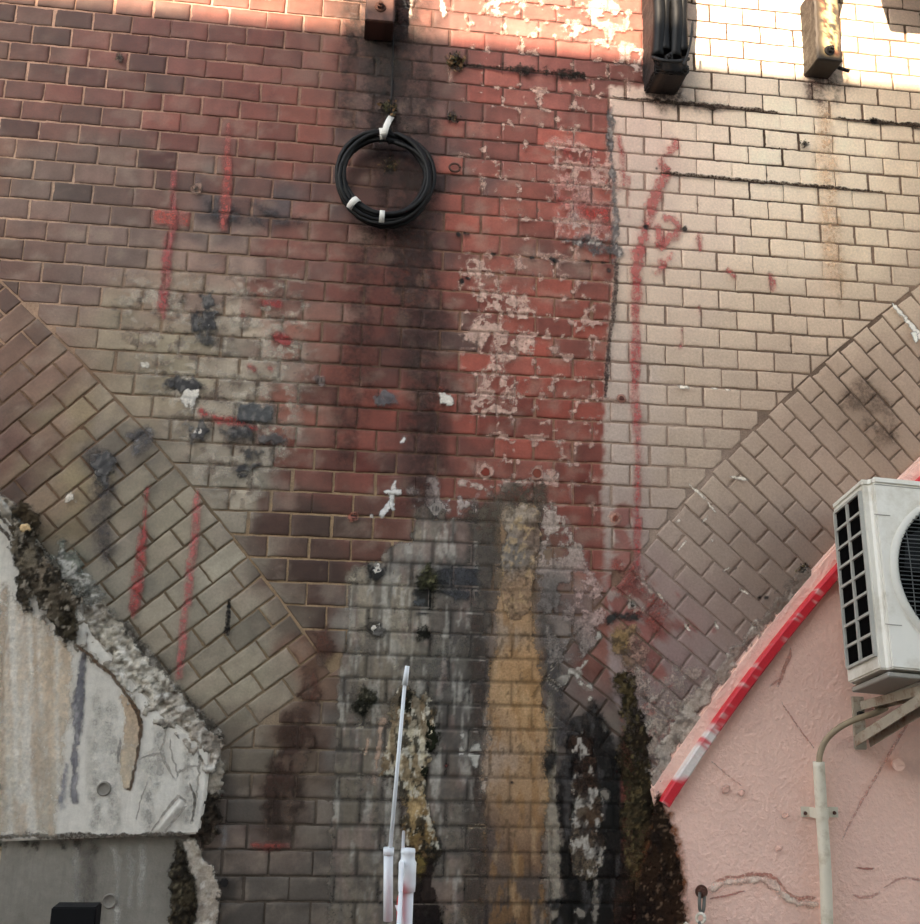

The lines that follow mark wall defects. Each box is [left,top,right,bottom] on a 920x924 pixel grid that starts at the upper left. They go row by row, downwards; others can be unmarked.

peeling [540,0,631,113]
damp [563,0,627,45]
damp [618,44,643,71]
crack [838,116,920,129]
damp [552,135,630,239]
crack [660,171,885,193]
peeling [495,200,606,362]
crack [491,96,778,397]
damp [260,188,690,924]
peeling [48,538,225,796]
corrosion [459,500,552,924]
peeling [182,838,221,924]